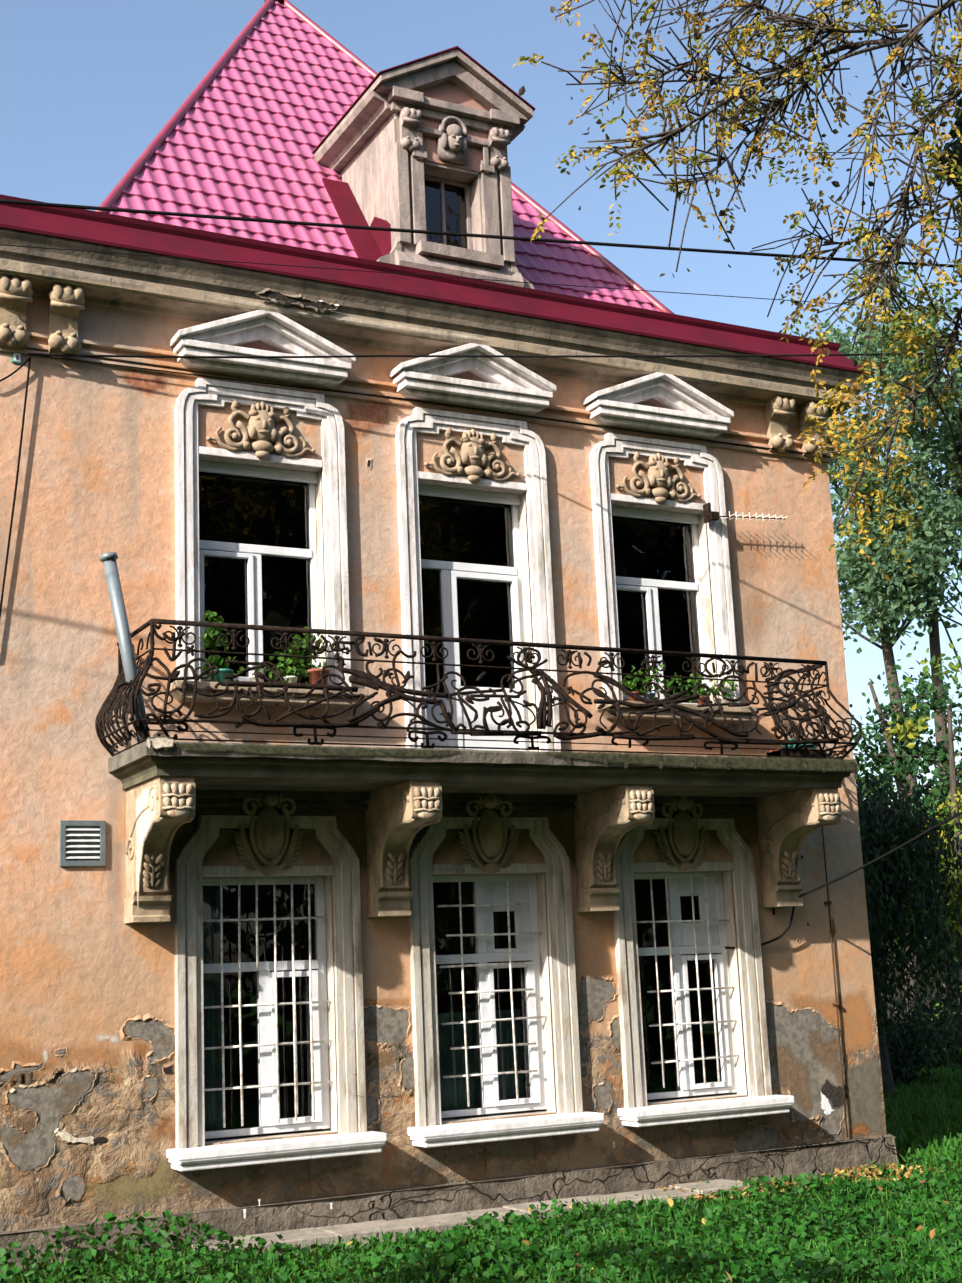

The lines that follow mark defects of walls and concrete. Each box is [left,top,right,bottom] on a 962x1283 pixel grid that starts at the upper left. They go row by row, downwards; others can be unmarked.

flaking render [0,1047,100,1177]
flaking render [119,1013,176,1105]
flaking render [366,1093,381,1132]
flaking render [364,1004,415,1097]
flaking render [576,973,621,1118]
flaking render [765,1000,847,1139]
flaking render [55,1173,86,1206]
crack [738,1155,776,1178]